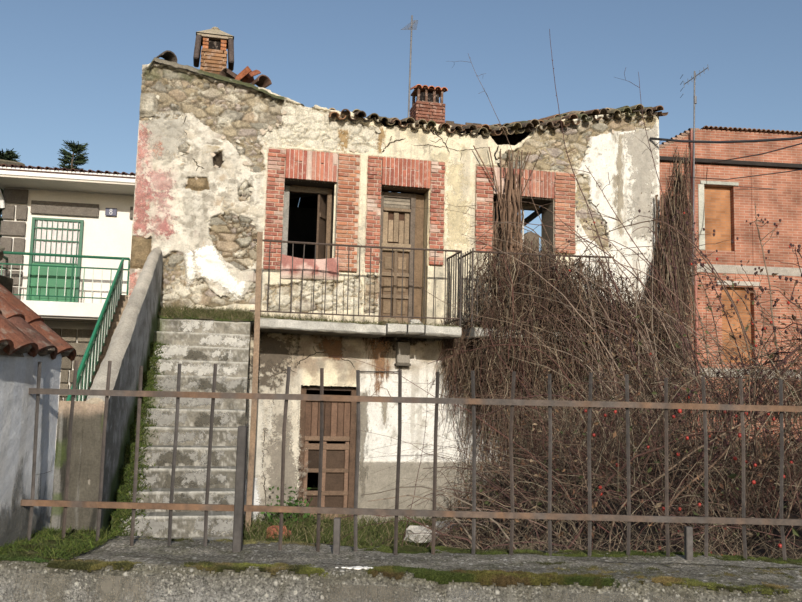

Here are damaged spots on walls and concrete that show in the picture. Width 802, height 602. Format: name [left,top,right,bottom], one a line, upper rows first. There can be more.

flaking render [139,66,385,173]
flaking render [185,175,210,191]
flaking render [238,180,254,202]
flaking render [495,114,659,252]
leakage [612,133,625,236]
flaking render [161,210,379,314]
peeling [146,319,250,536]
peeling [254,399,276,478]
peeling [289,384,301,487]
leakage [0,459,49,547]
peeling [122,518,168,535]